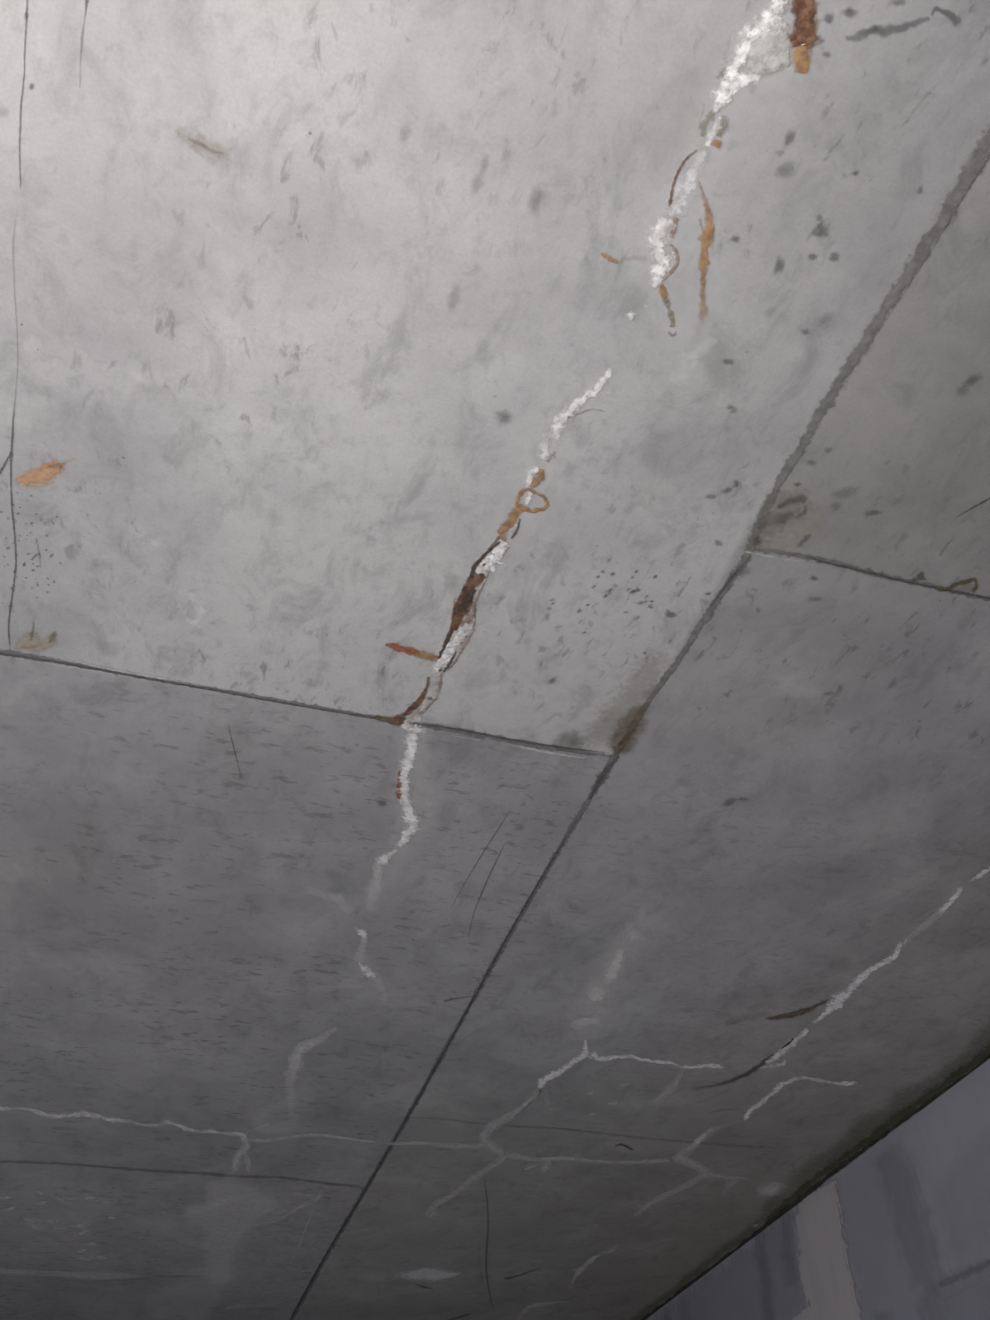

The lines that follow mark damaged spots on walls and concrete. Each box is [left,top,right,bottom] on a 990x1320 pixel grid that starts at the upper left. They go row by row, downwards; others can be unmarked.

leakage [868,25,906,34]
crack [648,0,818,327]
crack [374,368,613,867]
corrosion [385,643,440,661]
crack [938,866,990,915]
crack [537,941,902,1122]
crack [0,1107,130,1122]
crack [169,1122,247,1139]
crack [763,1183,788,1196]
crack [575,1255,599,1277]